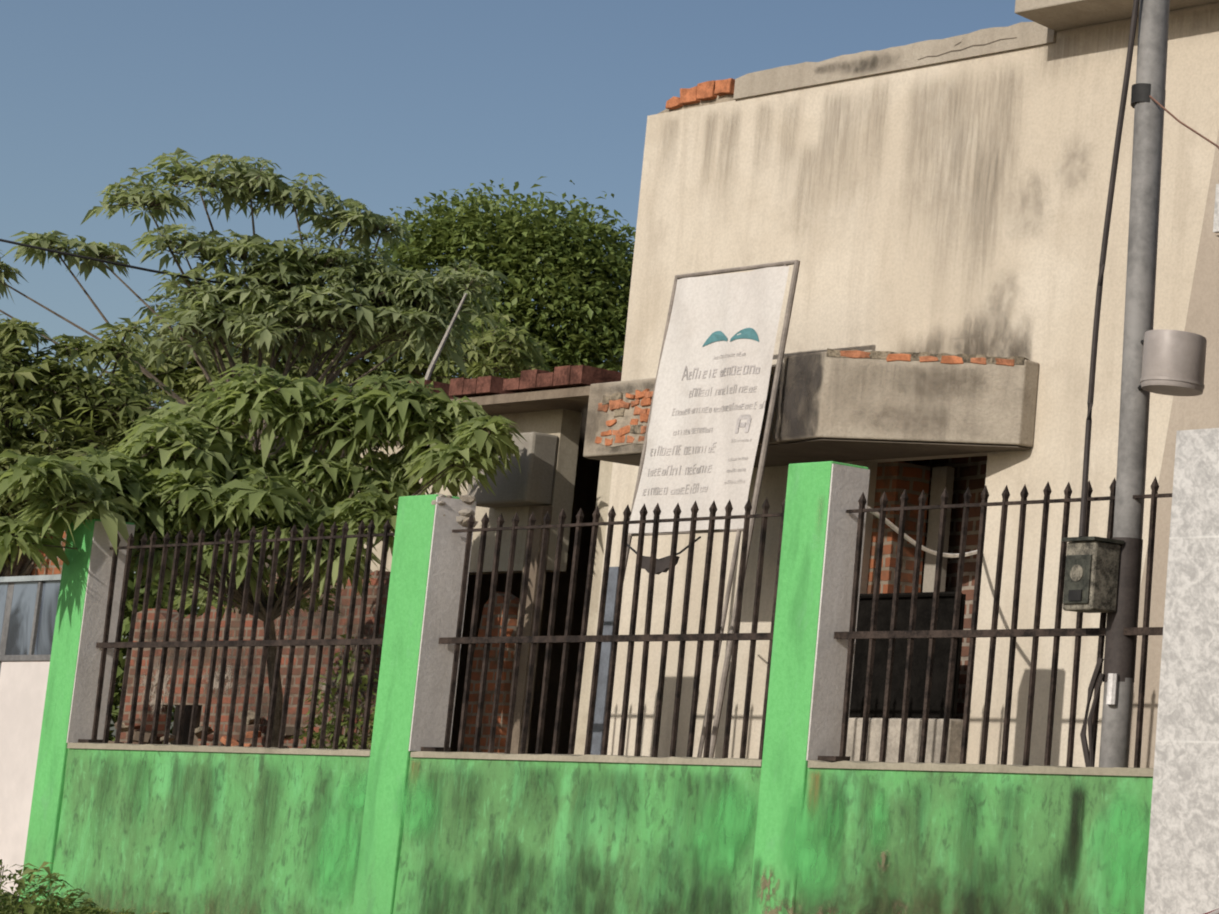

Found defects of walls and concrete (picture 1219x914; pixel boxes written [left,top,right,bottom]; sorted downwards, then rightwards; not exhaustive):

flaking render [665,78,735,110]
flaking render [826,348,1029,366]
damp [967,332,1027,357]
spalling [595,389,653,447]
damp [1104,804,1146,914]